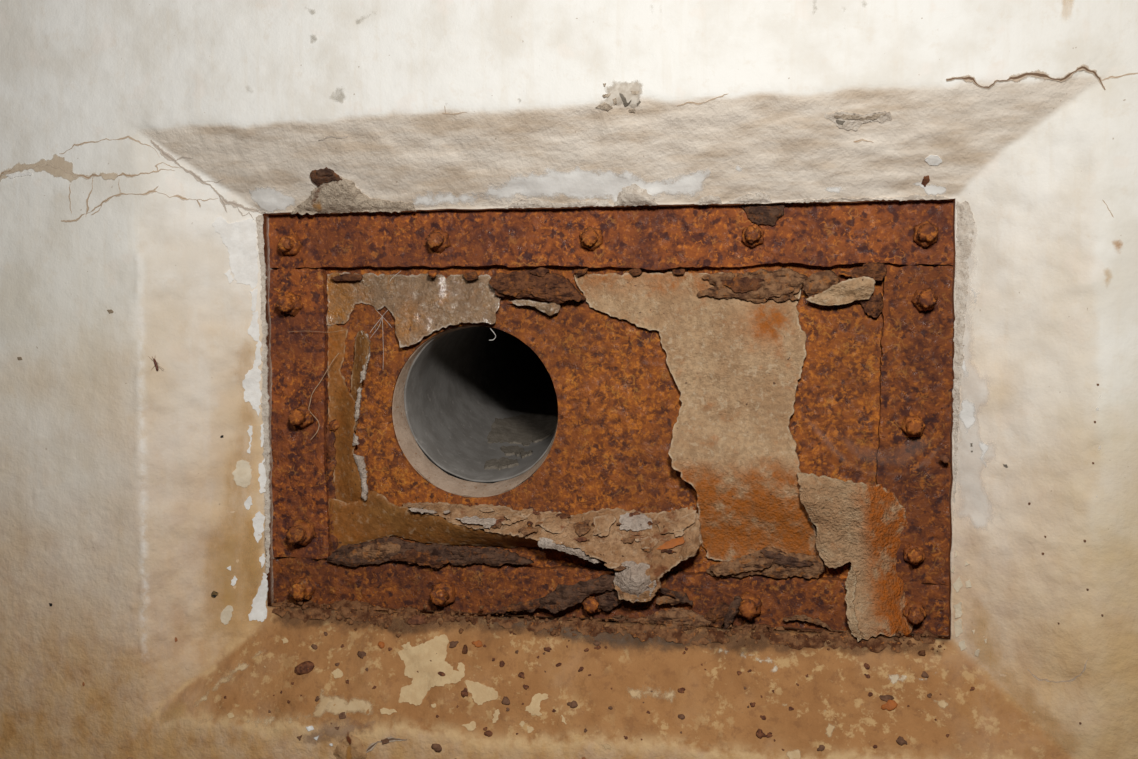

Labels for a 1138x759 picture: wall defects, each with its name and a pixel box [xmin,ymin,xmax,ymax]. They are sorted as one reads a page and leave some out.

spalling [595,82,642,113]
crack [946,65,1138,90]
crack [0,136,265,222]
spalling [291,167,417,215]
spalling [505,184,659,209]
spalling [695,191,975,521]
peeling [212,215,271,625]
peeling [326,272,914,642]
corrosion [294,661,315,675]
peeling [313,634,500,723]
corrosion [449,640,483,654]
corrosion [879,695,898,711]